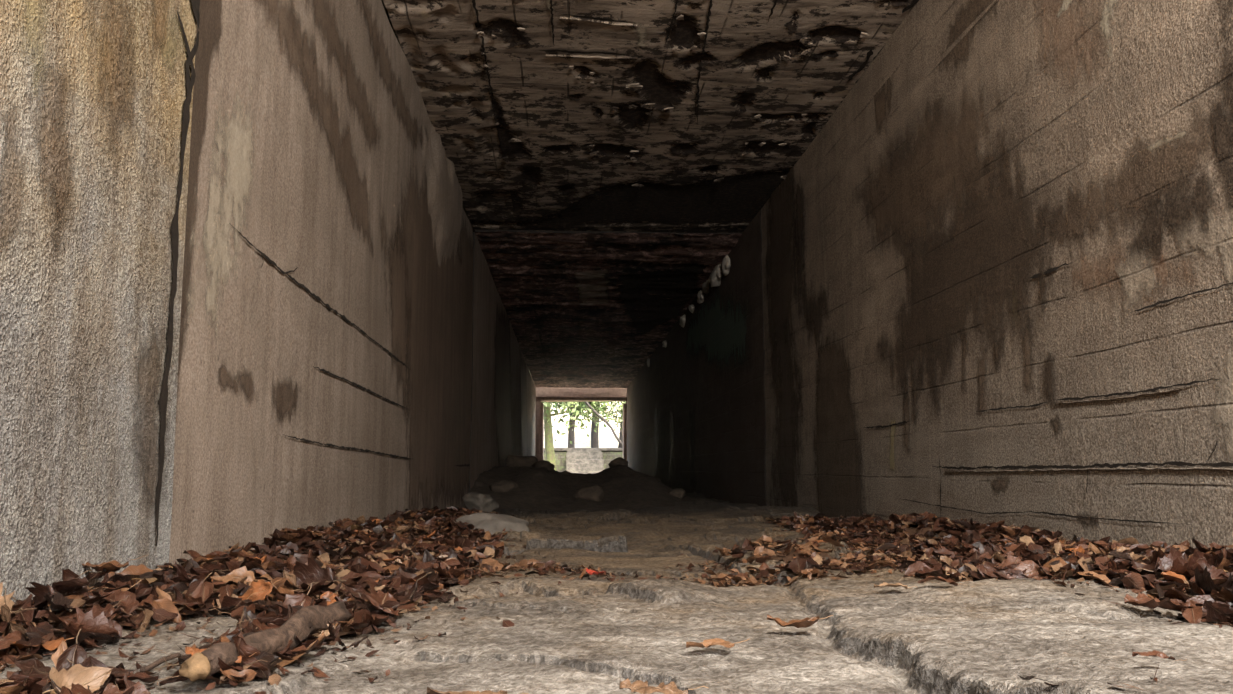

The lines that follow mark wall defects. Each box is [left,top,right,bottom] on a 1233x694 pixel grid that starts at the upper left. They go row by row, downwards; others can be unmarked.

damp [36,62,72,247]
damp [92,0,136,144]
crack [156,0,200,547]
damp [177,0,253,391]
crack [229,223,411,370]
damp [260,0,474,510]
spalling [475,18,532,49]
spalling [488,88,645,187]
crack [540,0,637,86]
damp [862,0,1233,470]
crack [976,379,1219,412]
crack [899,439,1233,524]